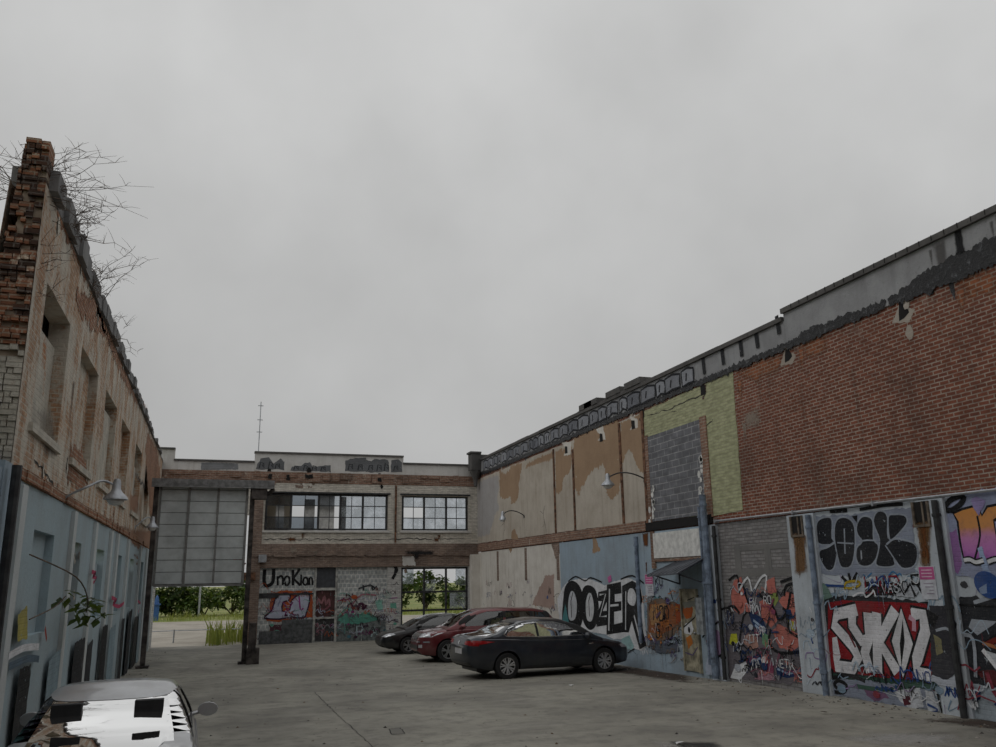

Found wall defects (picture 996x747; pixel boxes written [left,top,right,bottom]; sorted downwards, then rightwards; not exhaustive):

damp [954,229,964,255]
spalling [892,300,915,340]
flaking render [562,409,644,500]
spalling [161,457,526,538]